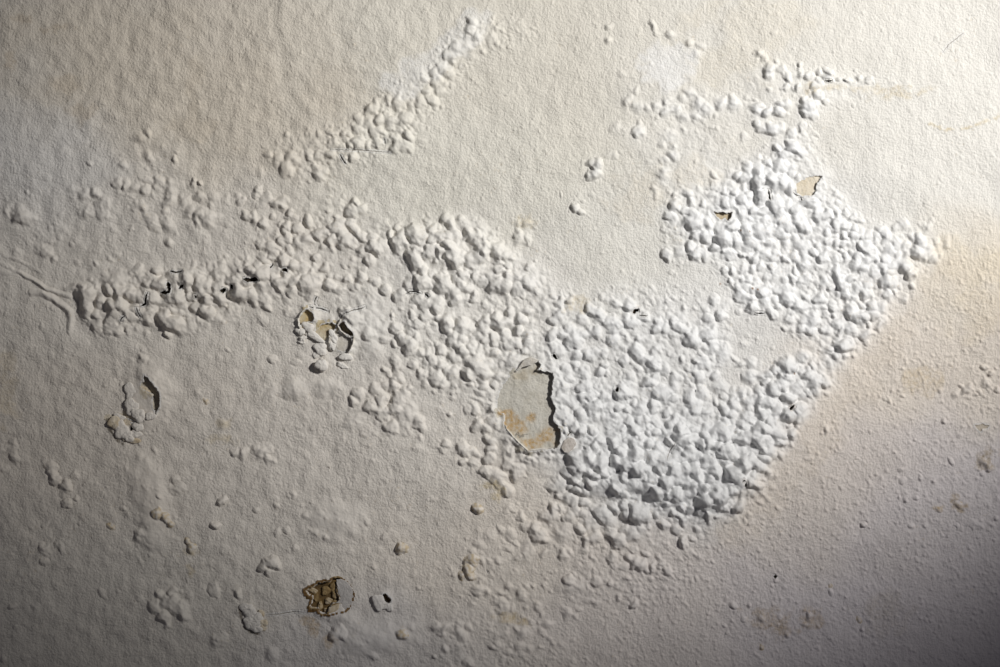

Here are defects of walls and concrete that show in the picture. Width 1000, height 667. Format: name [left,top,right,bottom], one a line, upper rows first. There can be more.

peeling [710,209,736,224]
peeling [793,173,825,199]
peeling [286,305,357,371]
peeling [104,372,162,447]
peeling [494,357,563,463]
peeling [295,567,355,626]